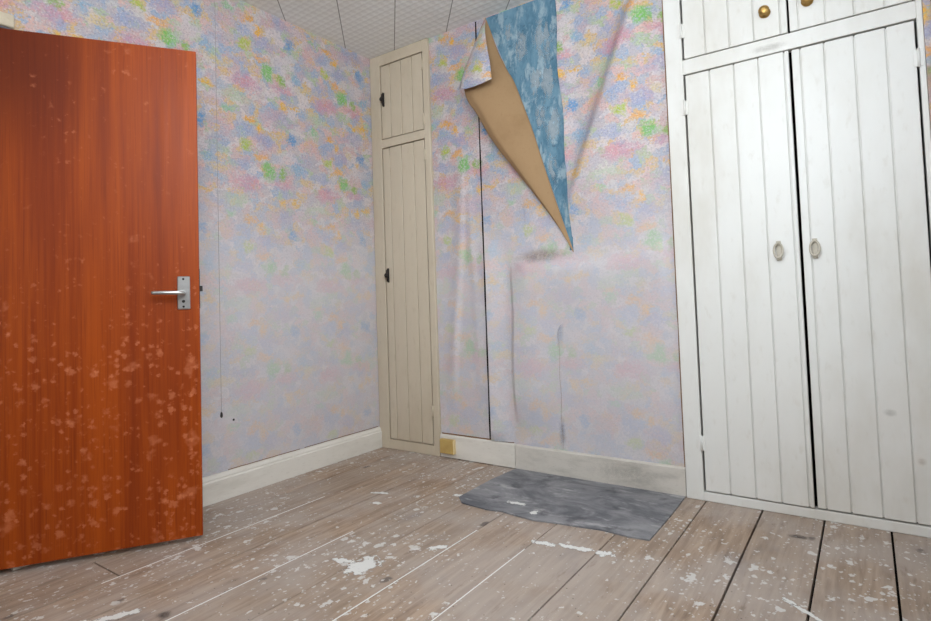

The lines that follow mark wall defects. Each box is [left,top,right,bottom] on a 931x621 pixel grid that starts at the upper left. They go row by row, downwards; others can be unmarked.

flaking render [486,0,573,250]